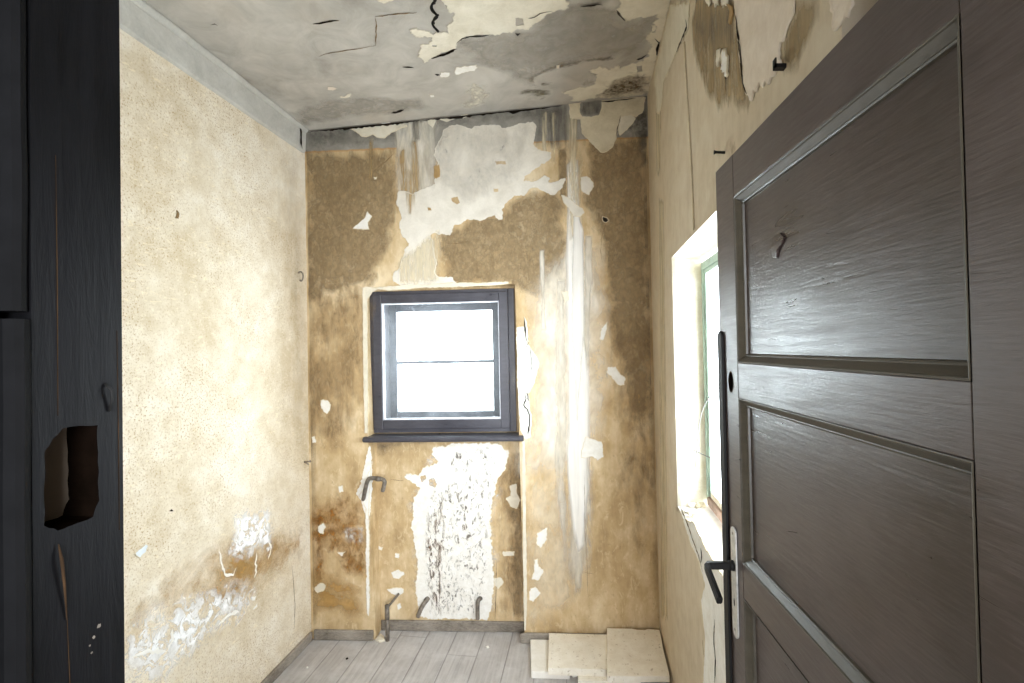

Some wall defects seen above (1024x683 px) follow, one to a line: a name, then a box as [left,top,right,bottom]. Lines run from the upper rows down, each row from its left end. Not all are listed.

crack [321,12,417,56]
flaking render [351,123,407,138]
peeling [439,64,478,78]
peeling [409,0,601,63]
peeling [562,0,690,172]
peeling [734,0,795,101]
peeling [829,0,855,32]
leakage [306,119,436,437]
peeling [362,122,566,433]
leakage [427,102,667,619]
peeling [387,326,547,630]
leakage [129,511,272,678]